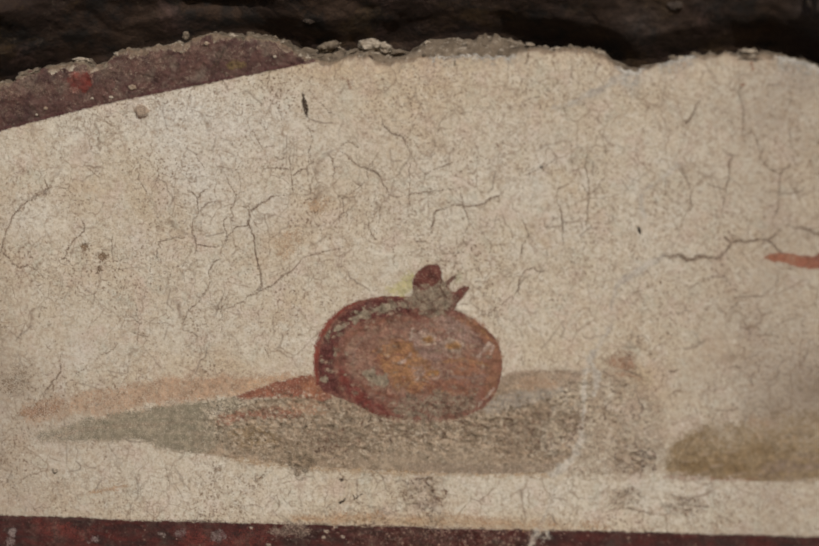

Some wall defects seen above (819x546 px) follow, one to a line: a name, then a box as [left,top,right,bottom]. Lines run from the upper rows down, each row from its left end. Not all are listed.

spalling [0,69,32,84]
spalling [44,31,819,93]
crack [1,172,66,277]
crack [61,221,85,266]
crack [111,116,603,340]
crack [528,70,819,546]